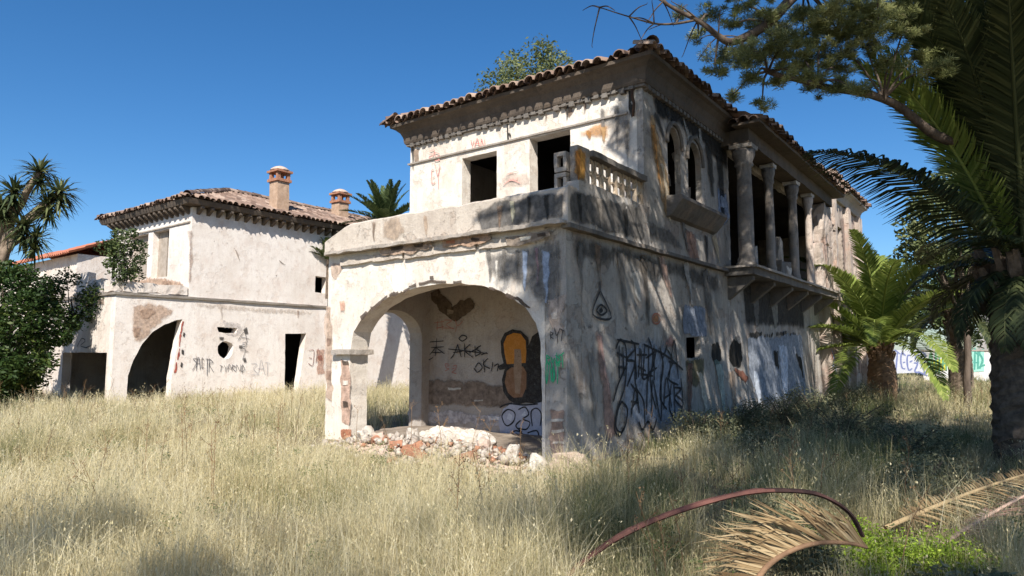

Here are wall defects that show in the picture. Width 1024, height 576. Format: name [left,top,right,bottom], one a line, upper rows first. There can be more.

flaking render [133,304,172,341]
flaking render [360,276,475,321]
flaking render [317,301,352,440]
flaking render [428,379,513,428]